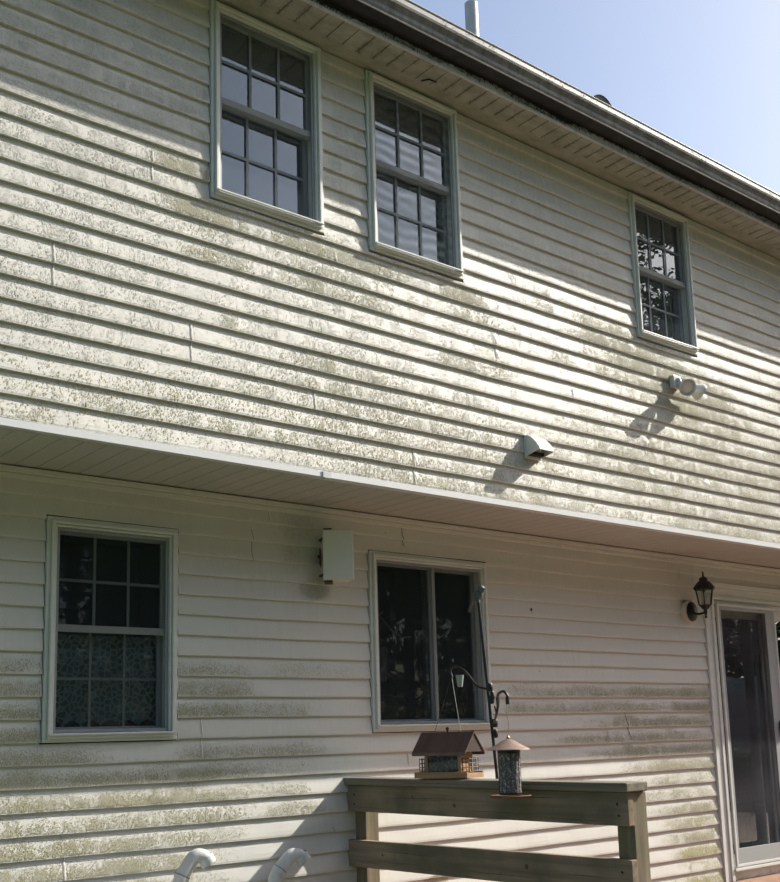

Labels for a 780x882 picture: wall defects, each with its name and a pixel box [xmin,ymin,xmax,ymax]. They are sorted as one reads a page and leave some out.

damp [0,0,780,542]